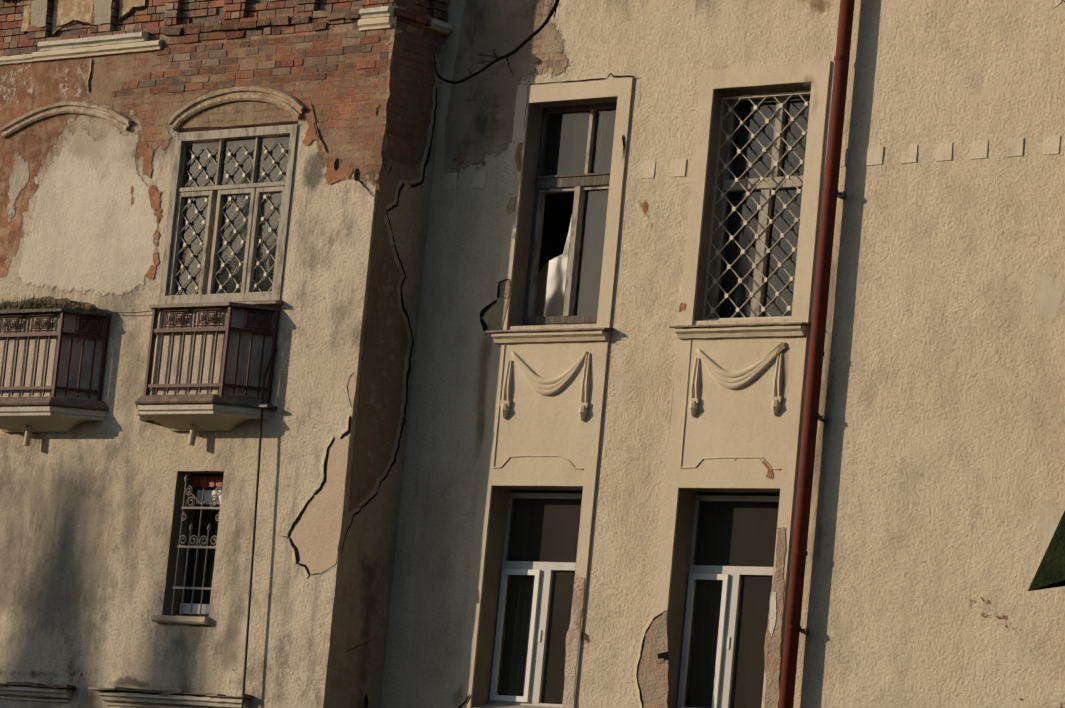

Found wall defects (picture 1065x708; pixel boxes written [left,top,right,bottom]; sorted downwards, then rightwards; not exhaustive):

peeling [0,0,569,575]
crack [281,87,438,579]
spalling [637,611,669,708]
spalling [764,527,786,708]